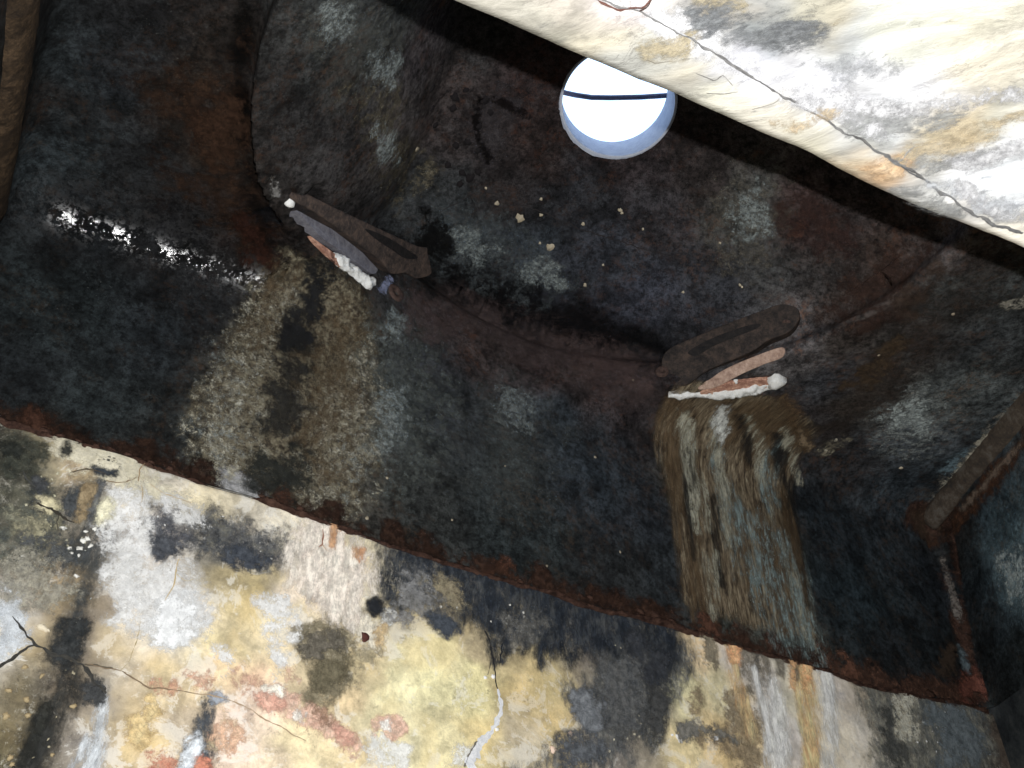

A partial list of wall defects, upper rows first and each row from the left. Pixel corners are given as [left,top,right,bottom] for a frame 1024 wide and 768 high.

crack [603,0,1024,234]
crack [22,469,74,531]
corrosion [0,403,223,488]
crack [106,463,191,503]
crack [165,559,192,600]
corrosion [256,485,460,564]
damp [0,249,839,768]
corrosion [689,427,1024,768]
crack [0,616,306,741]
crack [464,631,504,768]